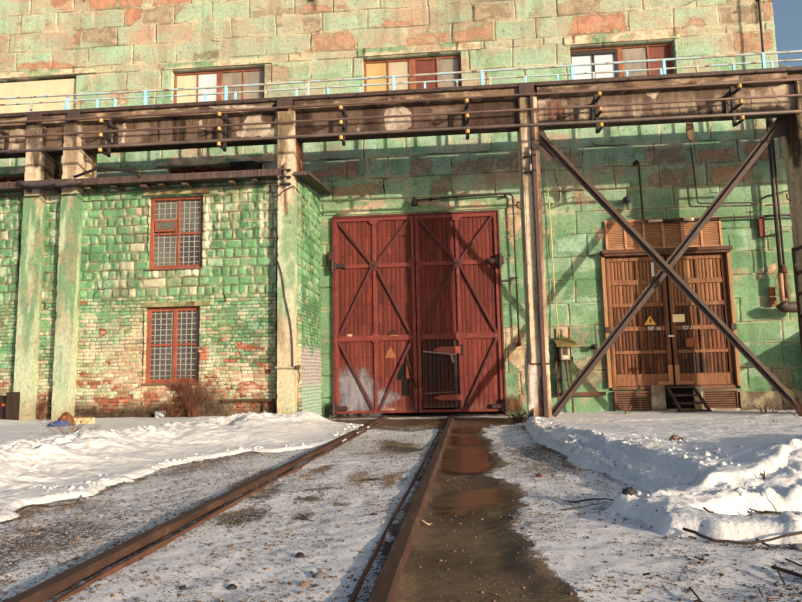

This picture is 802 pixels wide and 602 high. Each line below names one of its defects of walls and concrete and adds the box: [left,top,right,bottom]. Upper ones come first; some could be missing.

spalling [209,103,278,138]
spalling [383,106,412,130]
flaking render [223,342,275,374]
flaking render [76,371,161,412]
flaking render [205,375,271,410]